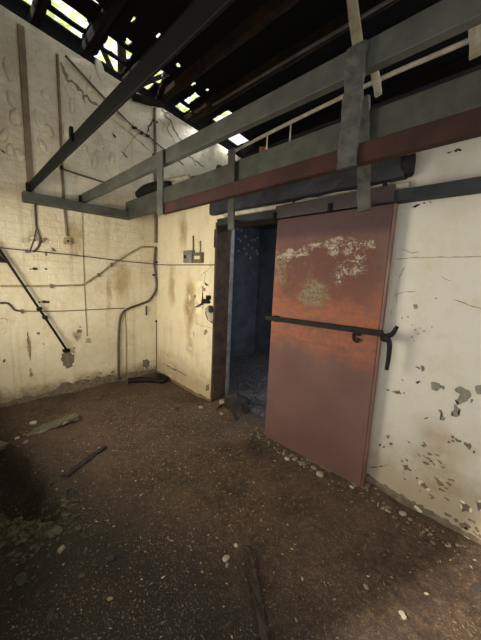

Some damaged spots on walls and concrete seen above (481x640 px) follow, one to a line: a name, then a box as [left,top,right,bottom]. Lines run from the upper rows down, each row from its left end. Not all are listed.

crack [60,62,99,106]
crack [112,108,182,159]
spalling [60,347,75,369]
spalling [0,359,214,408]
spalling [438,385,481,421]
spalling [365,473,481,545]